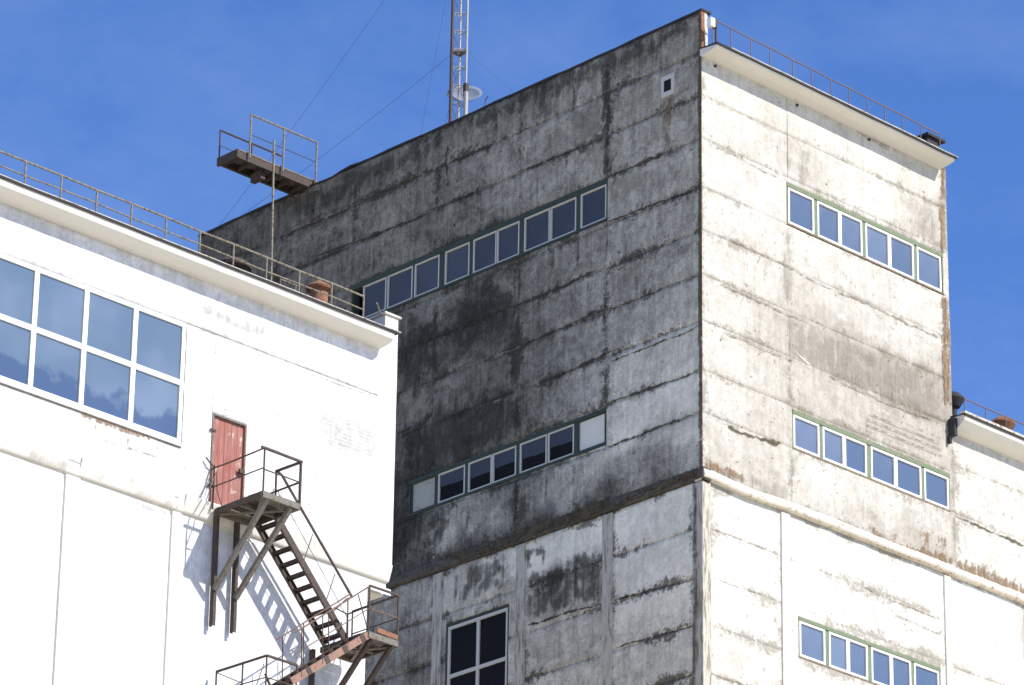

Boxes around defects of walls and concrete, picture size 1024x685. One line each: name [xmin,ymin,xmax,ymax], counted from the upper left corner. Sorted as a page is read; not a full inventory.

leakage [470,22,686,175]
leakage [282,135,441,217]
leakage [398,276,521,397]
rust [942,292,951,405]
leakage [417,510,449,542]
leakage [454,560,508,600]
leakage [526,547,602,617]
rust [884,530,1024,593]